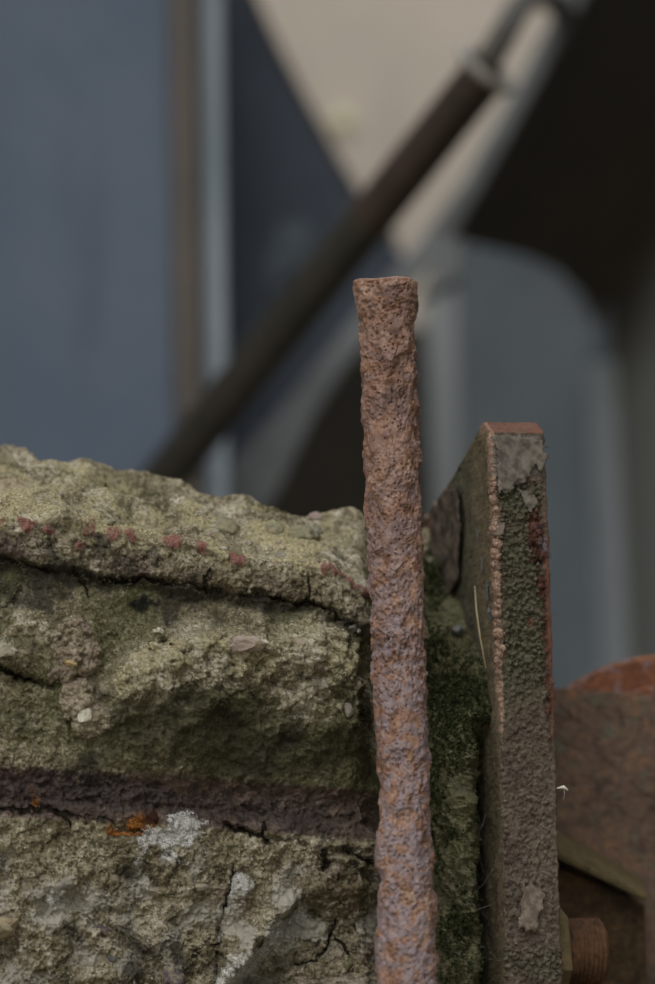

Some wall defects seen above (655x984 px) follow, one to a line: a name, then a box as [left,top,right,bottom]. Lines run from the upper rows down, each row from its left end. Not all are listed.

crack [28,566,344,621]
crack [191,867,234,982]
crack [296,919,350,965]